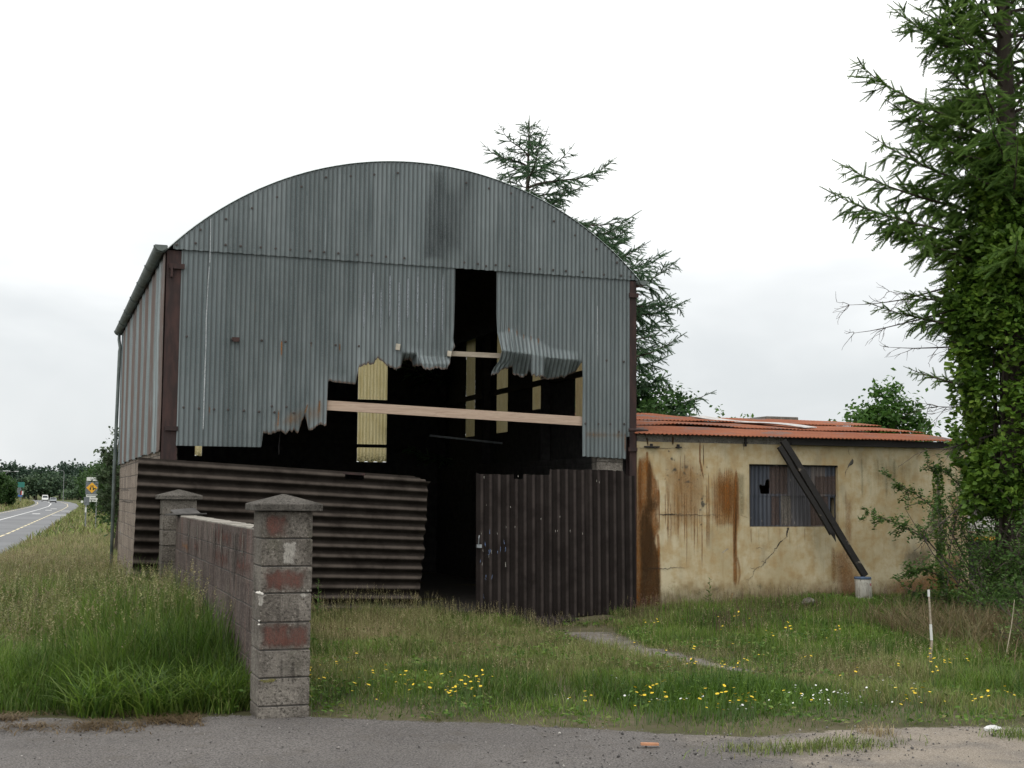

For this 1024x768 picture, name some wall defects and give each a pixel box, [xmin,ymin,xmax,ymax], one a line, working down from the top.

rust [636,438,660,609]
rust [714,470,740,583]